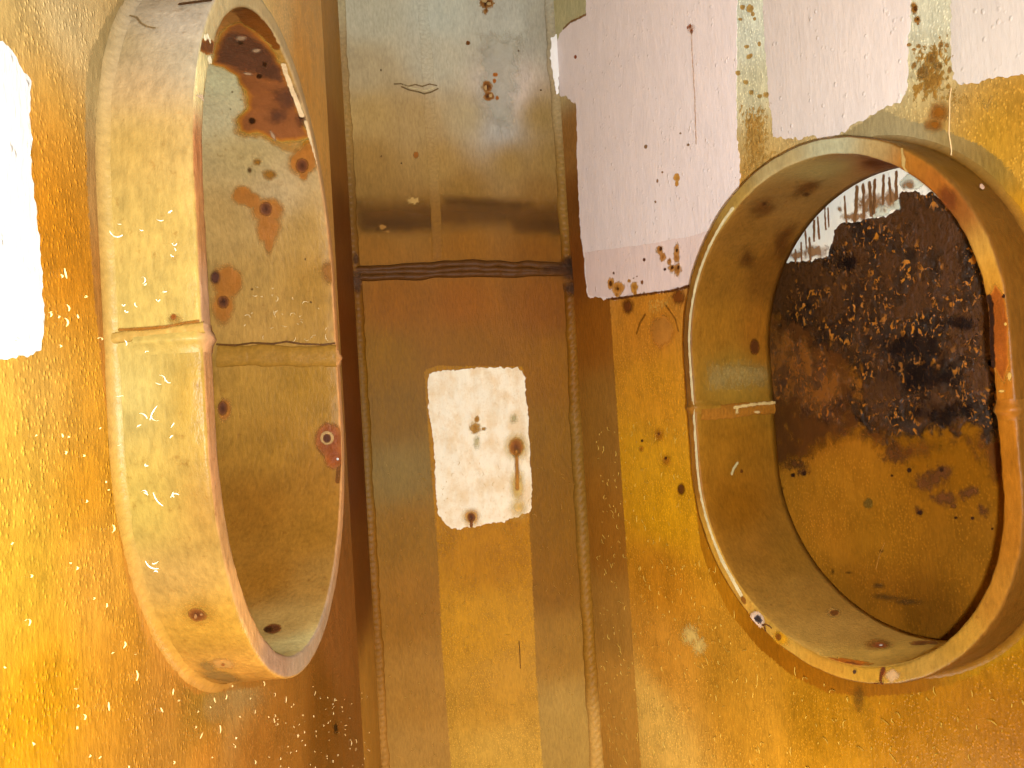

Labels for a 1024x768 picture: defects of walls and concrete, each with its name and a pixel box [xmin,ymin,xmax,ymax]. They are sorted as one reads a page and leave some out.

rust [200,9,316,180]
rust [926,105,947,129]
rust [233,186,283,253]
rust [608,244,690,301]
rust [986,284,1012,393]
rust [771,312,988,520]
rust [316,423,341,483]
rust [509,438,525,511]
rust [953,435,1003,484]